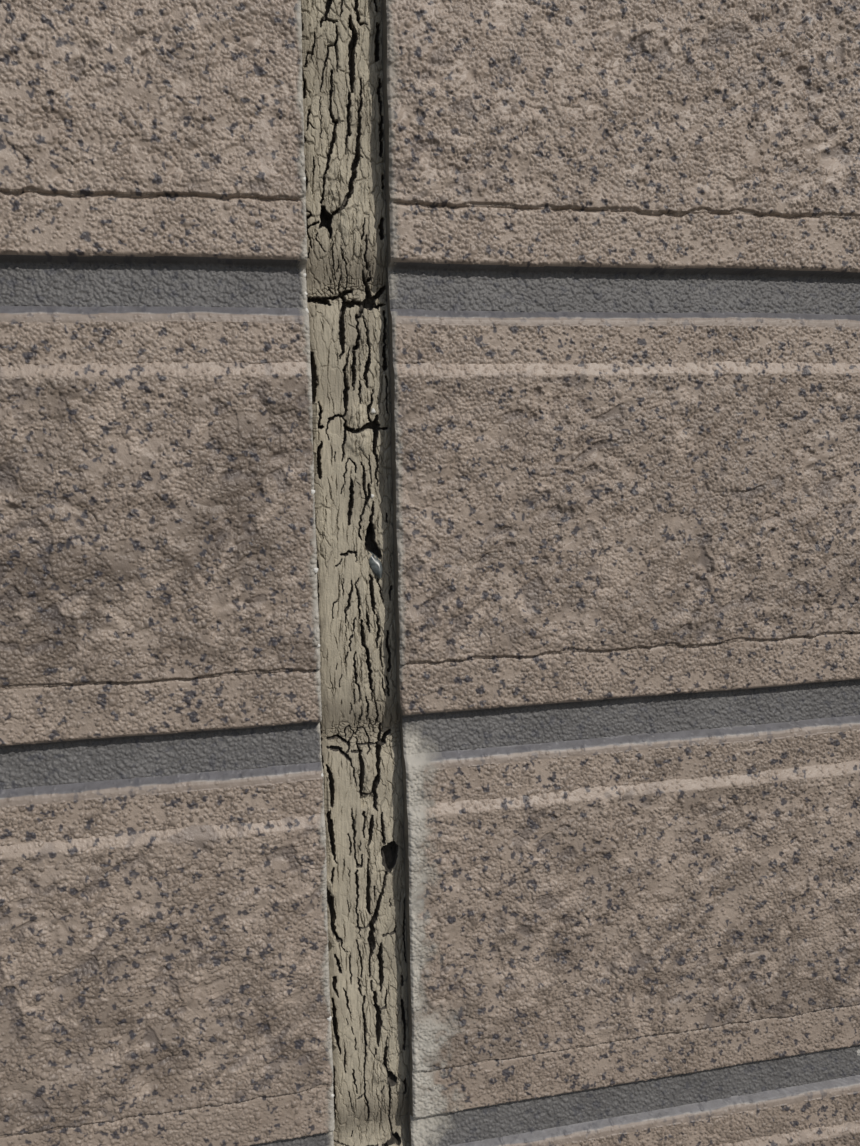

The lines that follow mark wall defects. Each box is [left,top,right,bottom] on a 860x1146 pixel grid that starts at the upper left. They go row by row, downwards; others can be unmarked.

crack [304,0,397,1146]